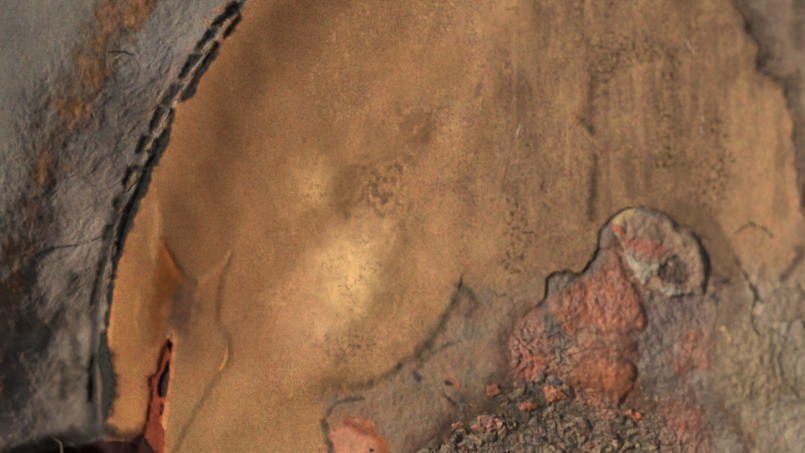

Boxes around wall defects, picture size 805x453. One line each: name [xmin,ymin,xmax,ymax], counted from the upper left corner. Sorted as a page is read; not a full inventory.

rust [46,0,155,130]
flaking render [201,0,236,29]
rust [142,333,173,453]
spalling [322,409,387,453]
spalling [412,206,746,453]
crack [734,256,799,398]